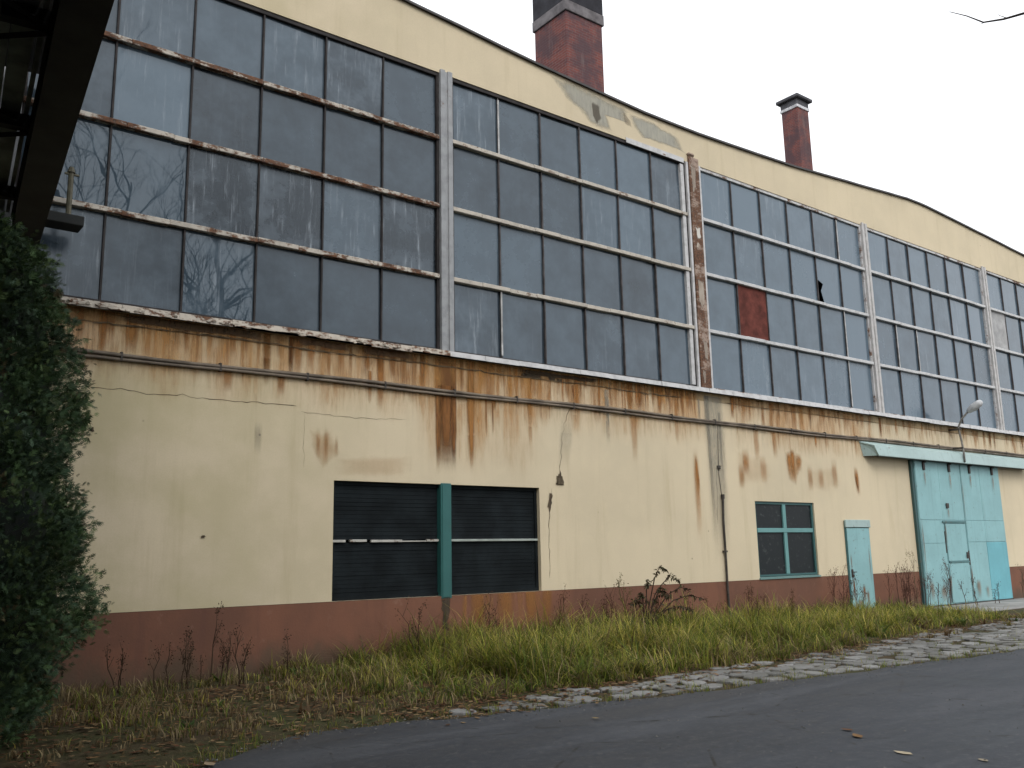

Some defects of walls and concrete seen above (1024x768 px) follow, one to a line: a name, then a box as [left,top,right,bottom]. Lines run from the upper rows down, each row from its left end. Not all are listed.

peeling [561,83,680,150]
spalling [63,299,275,341]
corrosion [221,332,352,387]
spalling [288,330,410,359]
corrosion [366,348,695,456]
crack [65,316,678,578]
corrosion [788,452,800,475]